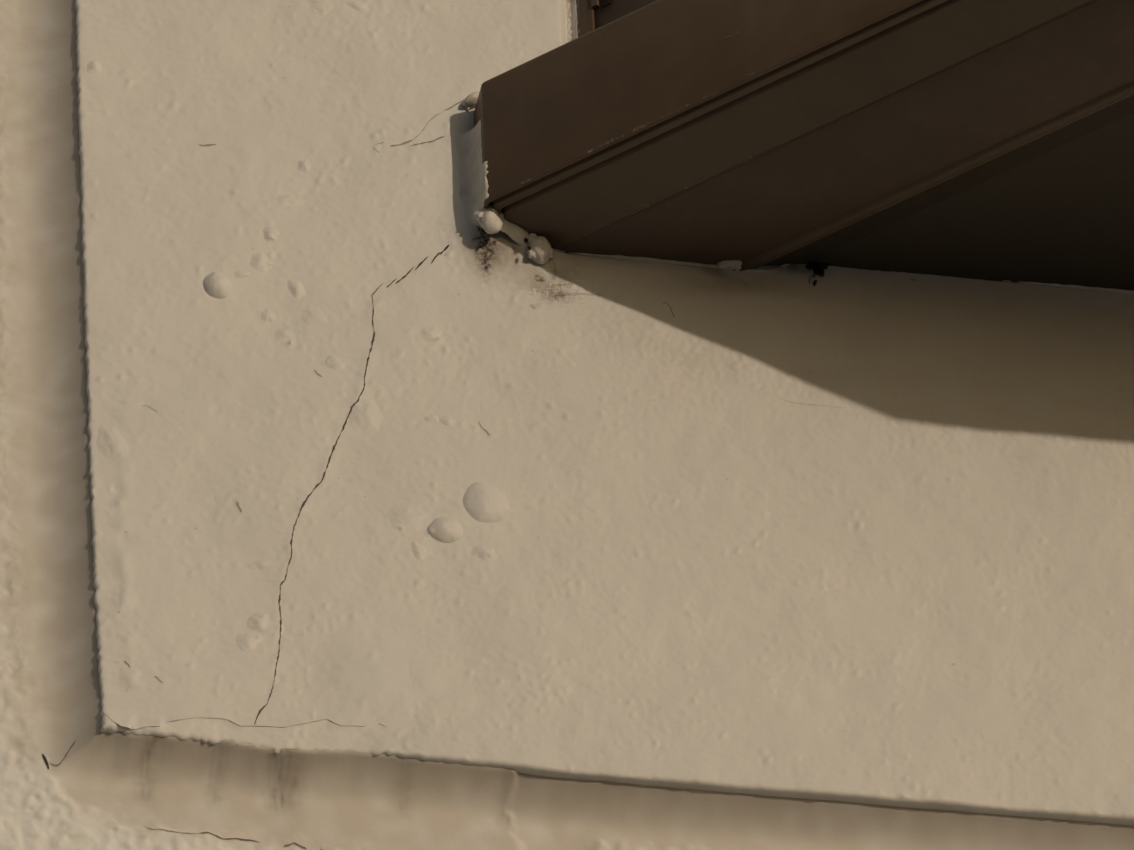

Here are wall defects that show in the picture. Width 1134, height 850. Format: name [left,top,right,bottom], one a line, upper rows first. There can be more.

crack [254,245,449,724]